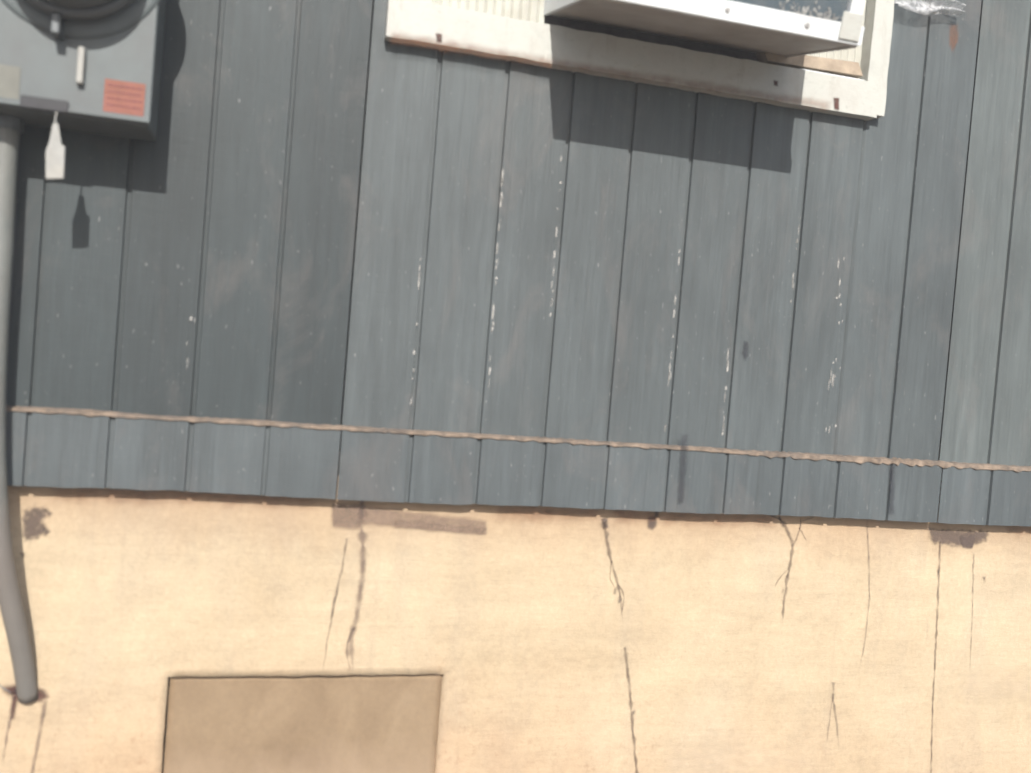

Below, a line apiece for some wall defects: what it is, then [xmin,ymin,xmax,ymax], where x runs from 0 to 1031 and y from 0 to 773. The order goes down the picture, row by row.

spalling [23,508,51,539]
crack [358,501,366,598]
leakage [334,505,485,534]
spalling [929,529,988,548]